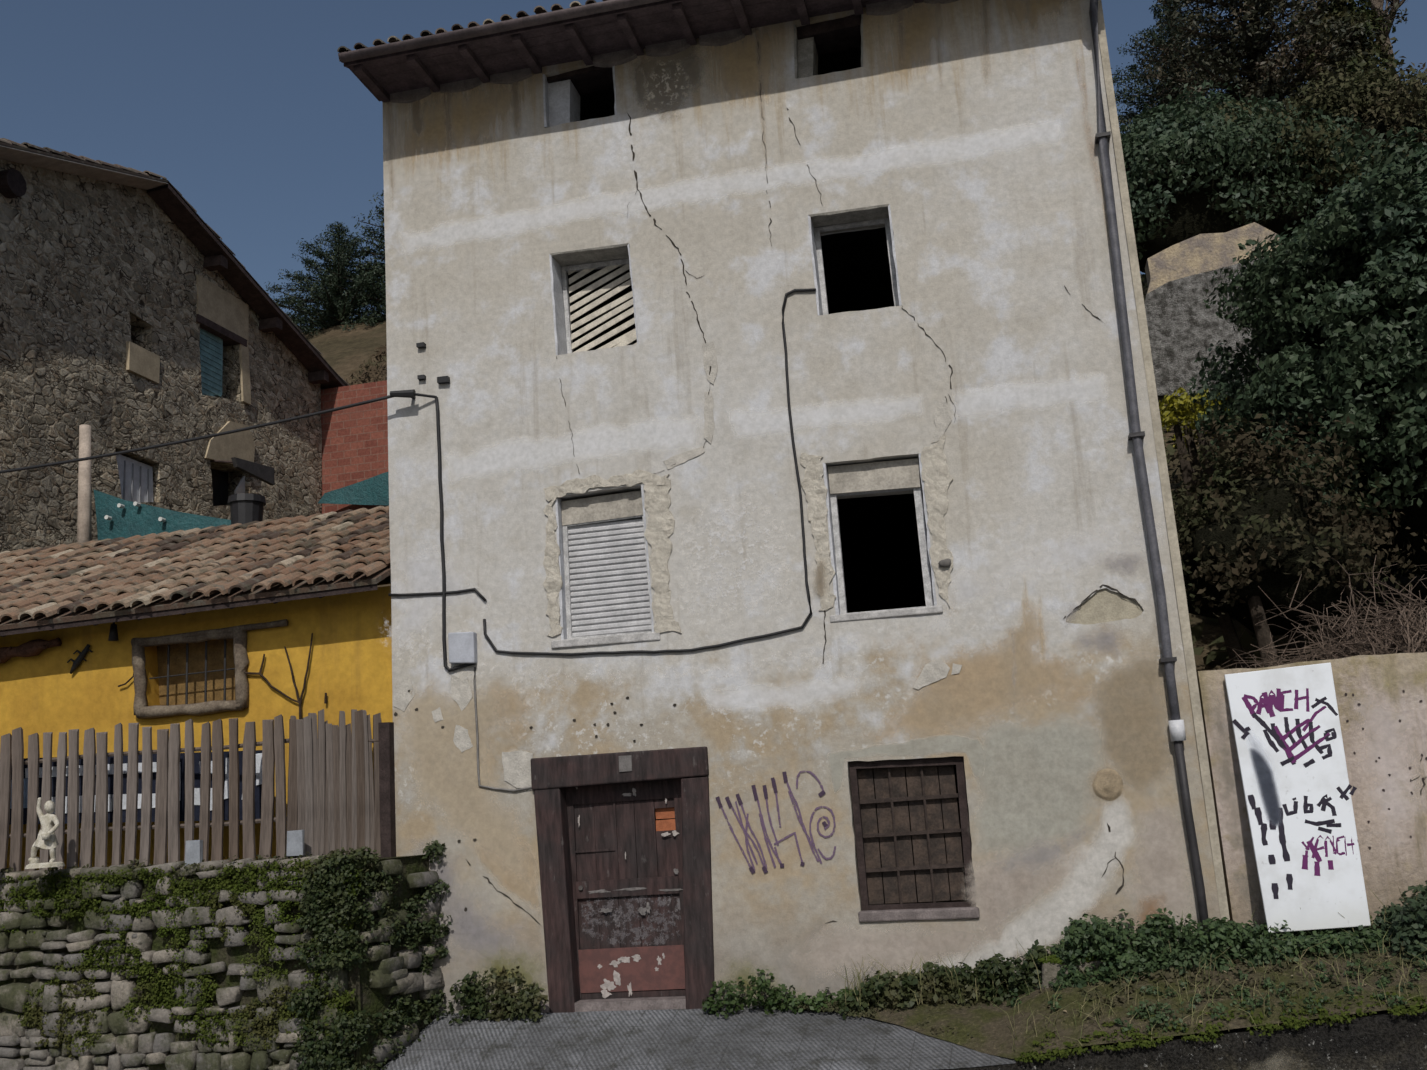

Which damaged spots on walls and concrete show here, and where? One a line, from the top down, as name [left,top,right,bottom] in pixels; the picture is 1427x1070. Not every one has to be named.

water stain [388,83,524,162]
water stain [635,31,773,128]
crack [757,43,822,246]
water stain [888,3,943,81]
crack [627,114,718,474]
crack [902,306,956,443]
flaking render [1064,584,1144,625]
water stain [1081,633,1171,791]
water stain [421,854,513,959]